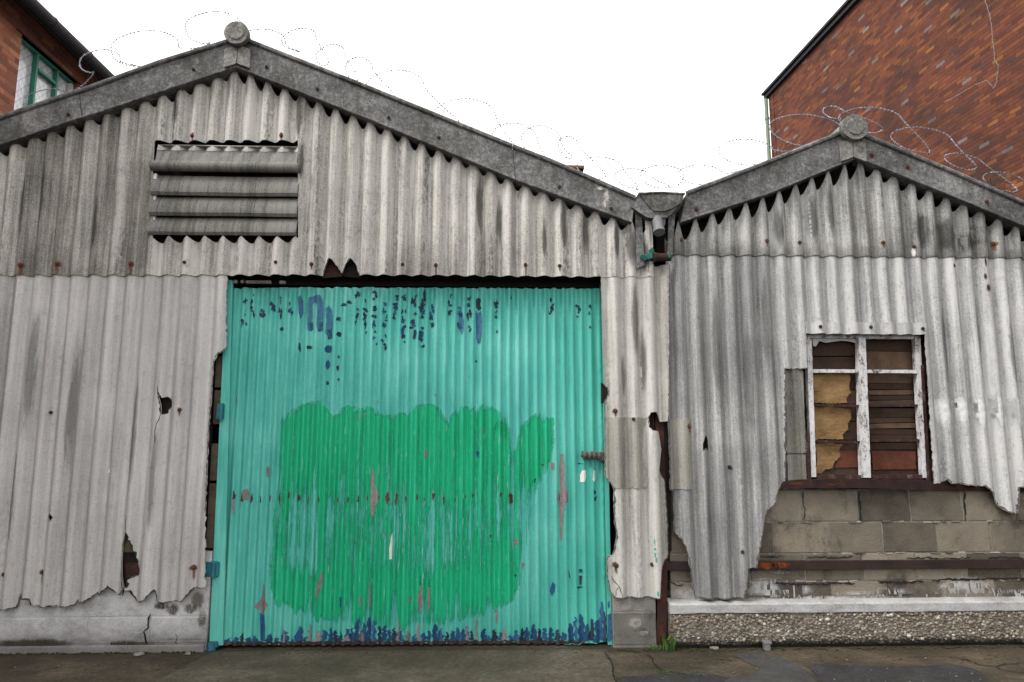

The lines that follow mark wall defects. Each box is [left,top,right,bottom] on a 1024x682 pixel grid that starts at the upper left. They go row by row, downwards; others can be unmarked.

peeling [448,294,499,344]
peeling [224,454,664,643]
spalling [5,552,210,630]
crack [139,613,151,645]